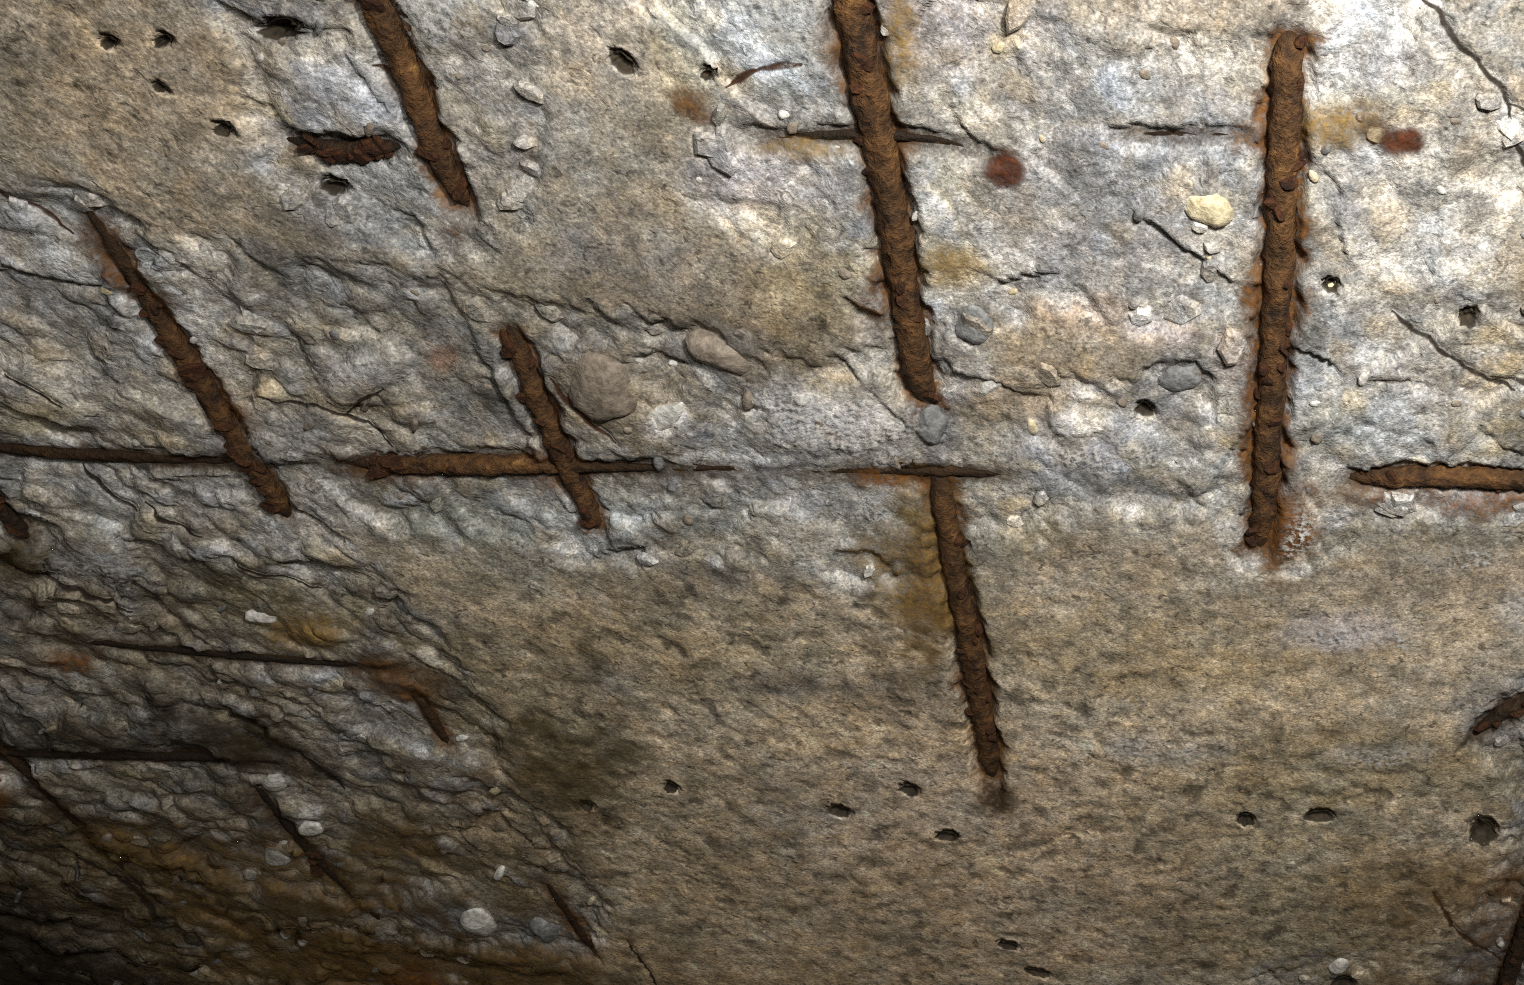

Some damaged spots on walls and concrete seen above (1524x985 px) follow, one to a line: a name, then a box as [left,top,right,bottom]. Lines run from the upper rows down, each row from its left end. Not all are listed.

corrosion [157,297,294,513]
corrosion [391,0,476,210]
corrosion [494,325,686,533]
corrosion [869,246,892,316]
corrosion [871,2,922,167]
corrosion [896,346,947,409]
corrosion [986,151,1024,186]
corrosion [1234,27,1322,569]
corrosion [1289,97,1364,327]
crack [1423,0,1524,165]
corrosion [123,617,457,745]
corrosion [831,464,1011,813]